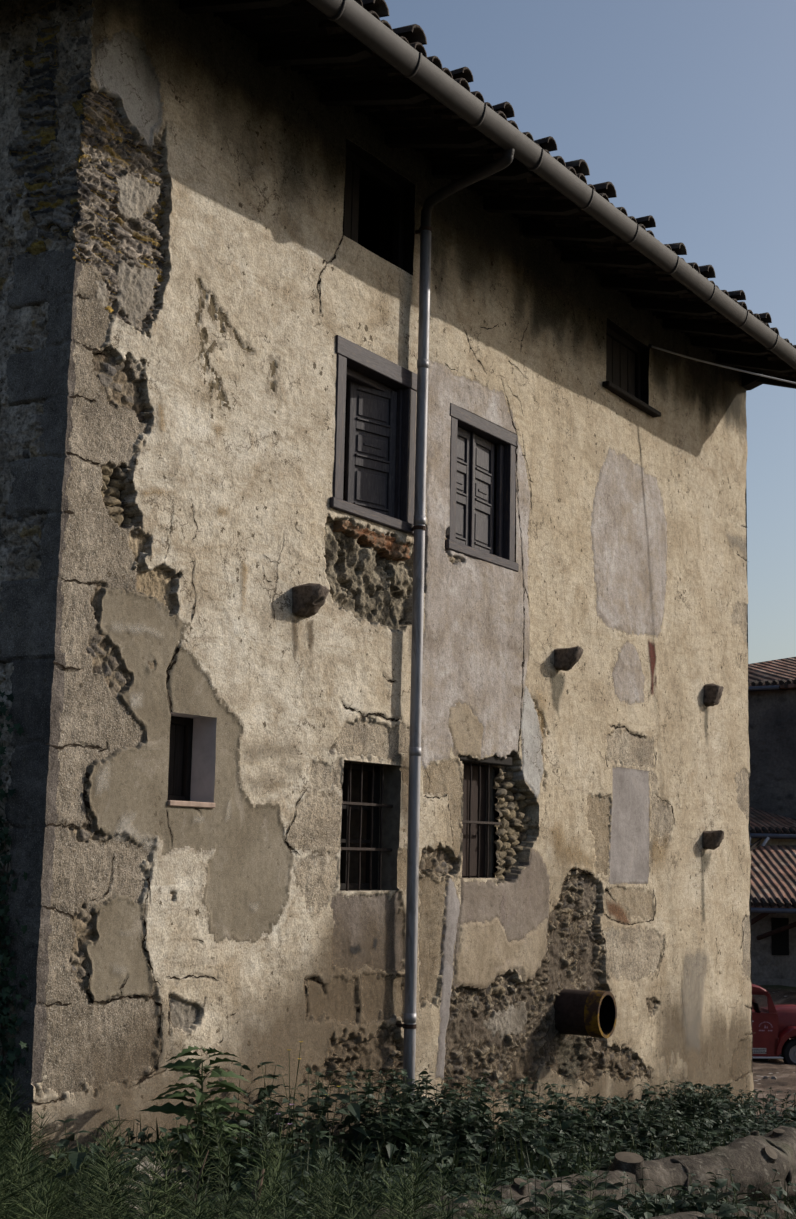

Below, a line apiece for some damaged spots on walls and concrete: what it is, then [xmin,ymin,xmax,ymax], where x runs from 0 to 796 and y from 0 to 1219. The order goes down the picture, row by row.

crack [317,236,343,312]
spalling [324,519,413,630]
spalling [42,262,158,1098]
crack [341,701,401,722]
crack [285,789,307,855]
spalling [587,1036,654,1079]